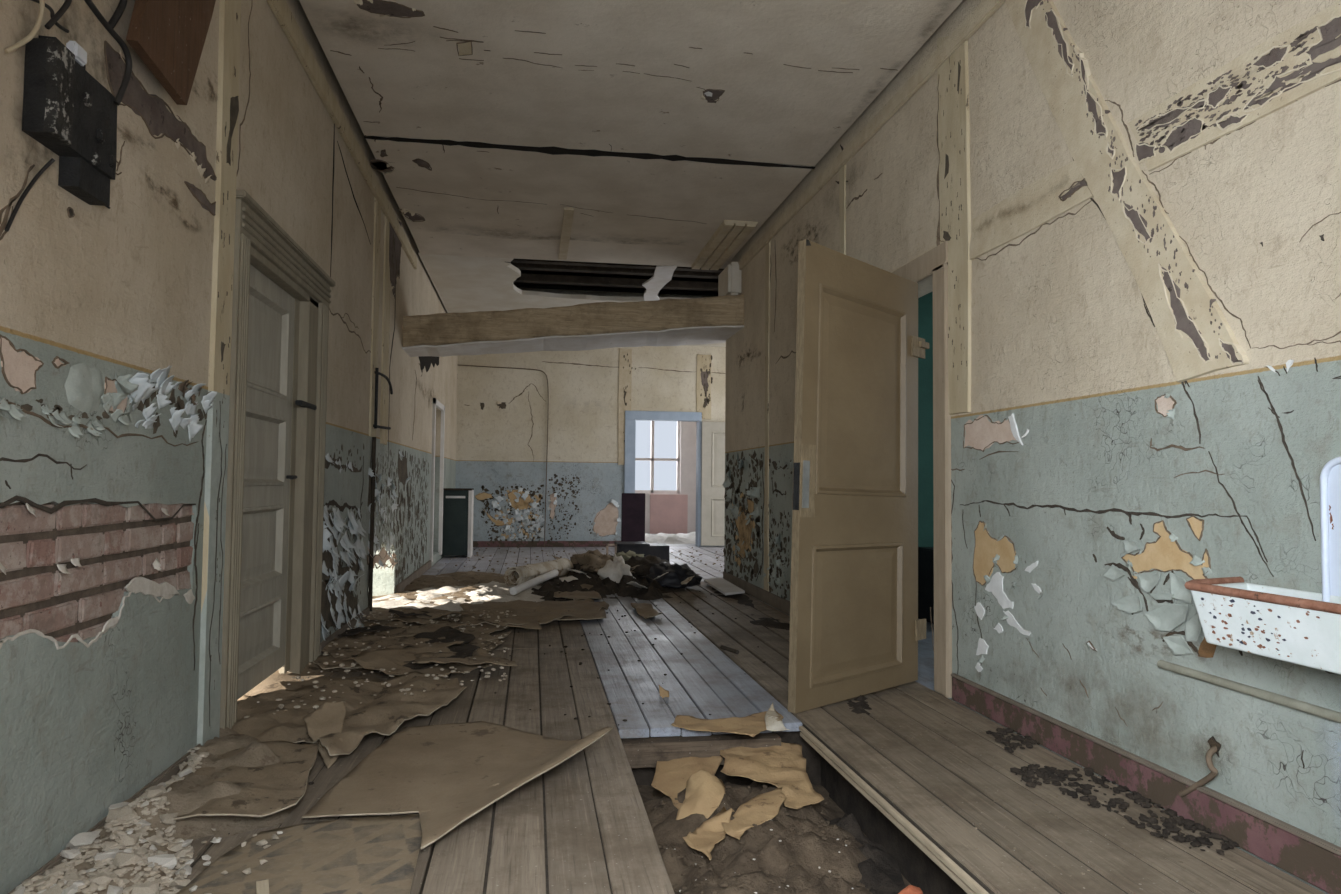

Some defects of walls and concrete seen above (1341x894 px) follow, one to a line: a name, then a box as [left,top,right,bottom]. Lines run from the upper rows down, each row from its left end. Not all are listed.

peeling [104,41,239,216]
peeling [1024,0,1341,365]
peeling [0,334,230,447]
crack [1105,100,1341,541]
spalling [0,502,195,650]
crack [0,403,227,726]
peeling [321,443,429,640]
peeling [722,450,792,599]
peeling [973,521,1044,672]
crack [1026,638,1163,727]
crack [930,381,1274,675]
peeling [1120,516,1212,579]